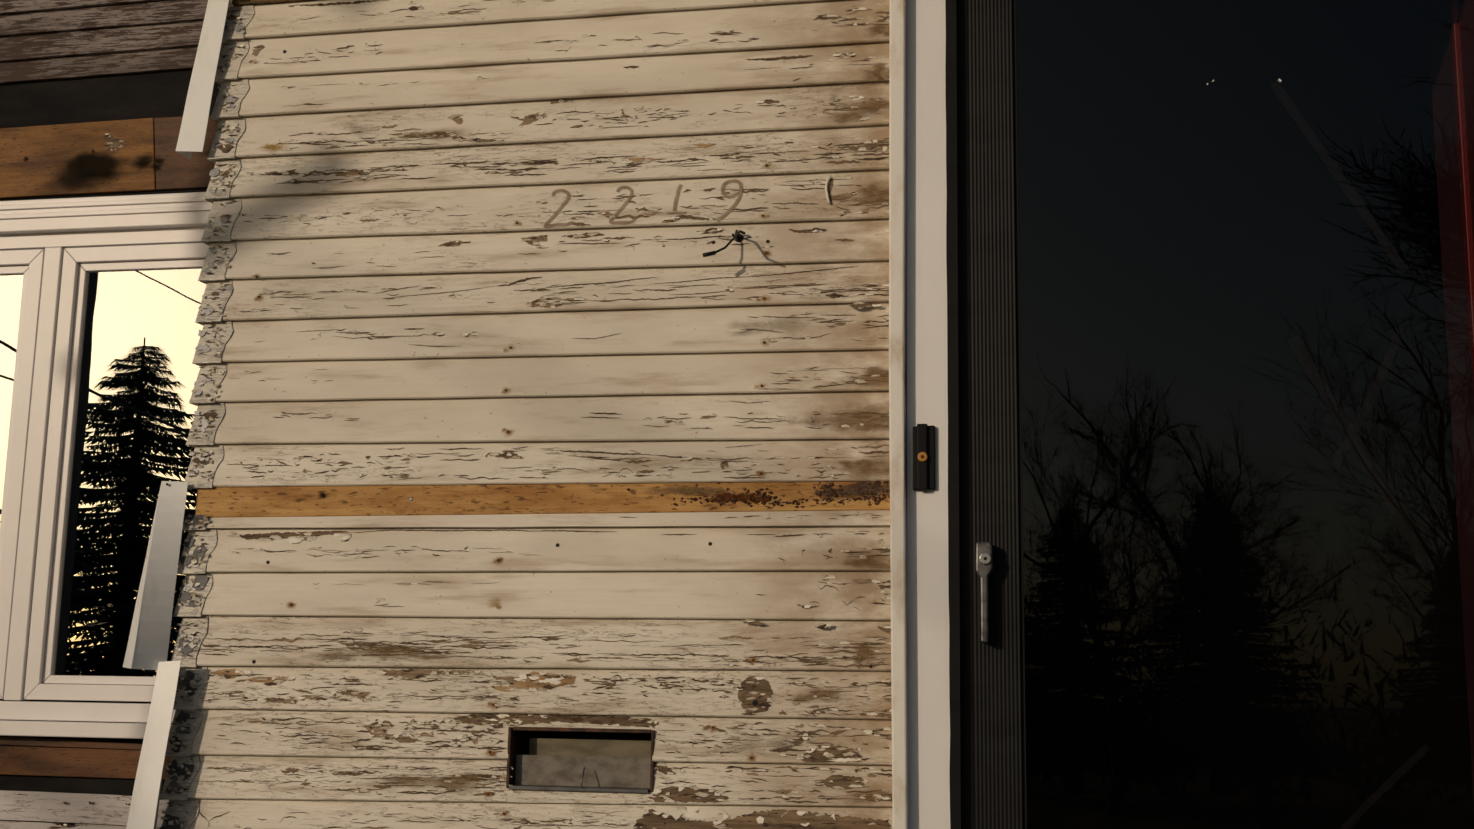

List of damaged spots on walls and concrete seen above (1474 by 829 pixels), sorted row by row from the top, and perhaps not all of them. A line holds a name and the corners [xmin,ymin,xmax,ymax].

peeling [511,99,573,126]
peeling [420,115,504,142]
peeling [521,210,635,248]
peeling [635,206,722,234]
peeling [187,9,265,481]
peeling [825,293,881,309]
peeling [160,514,372,829]
peeling [381,668,576,692]
peeling [735,676,774,715]
peeling [367,728,421,743]
peeling [446,713,658,741]
peeling [634,736,892,829]